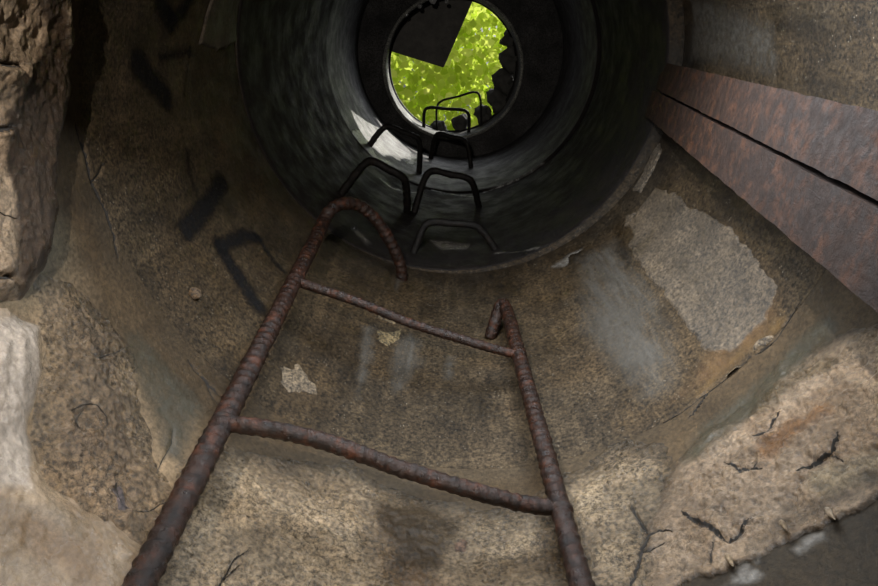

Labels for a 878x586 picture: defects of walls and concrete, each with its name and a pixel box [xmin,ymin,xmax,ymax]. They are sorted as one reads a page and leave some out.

peeling [624,143,778,353]
crack [724,462,762,473]
crack [752,411,780,436]
crack [796,431,844,471]
water stain [159,444,569,586]
crack [630,503,751,586]